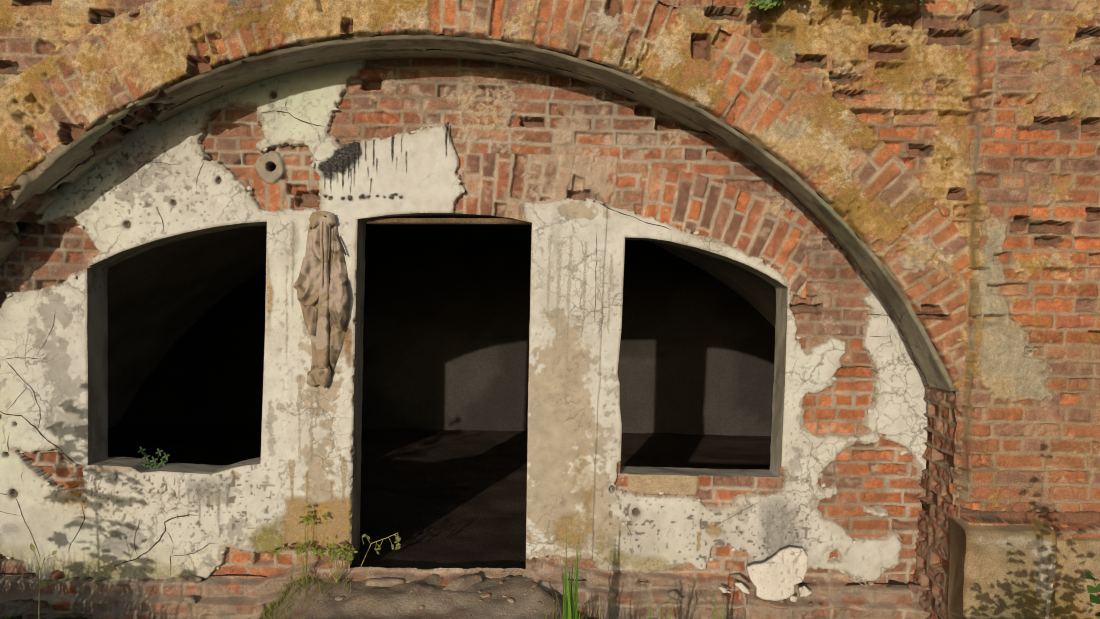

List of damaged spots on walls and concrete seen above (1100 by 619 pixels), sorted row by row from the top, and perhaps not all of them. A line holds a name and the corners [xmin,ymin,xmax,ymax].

spalling [23,121,87,177]
flaking render [90,14,213,189]
flaking render [201,107,320,211]
water stain [324,140,377,191]
flaking render [771,0,1100,389]
flaking render [0,182,102,445]
flaking render [328,58,923,559]
crack [866,314,927,380]
crack [0,315,76,557]
flaking render [20,449,85,489]
crack [109,514,214,576]